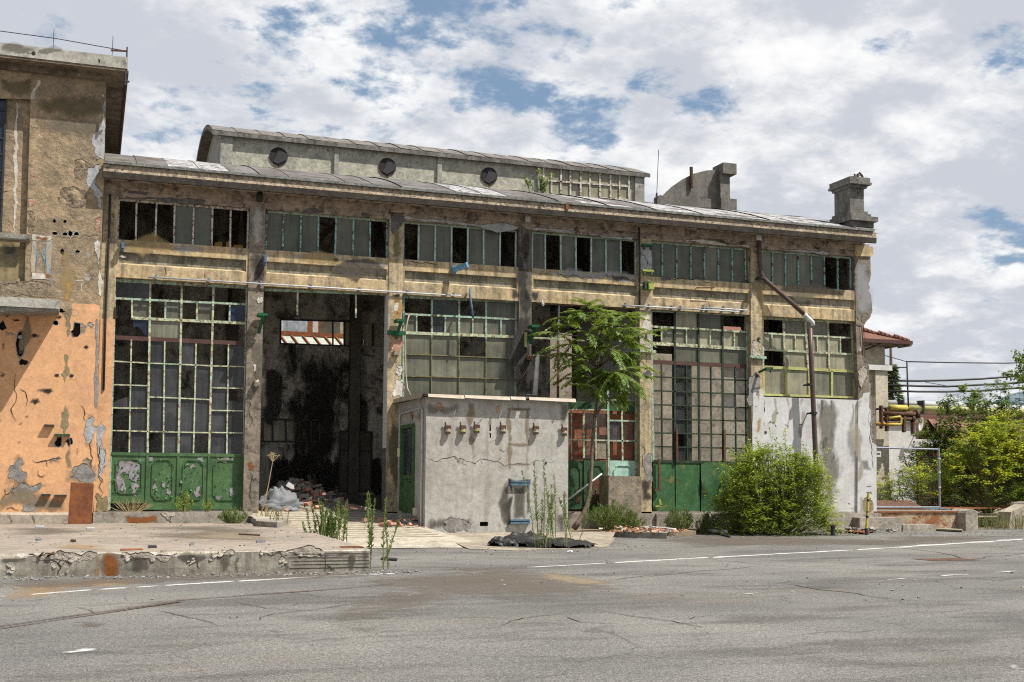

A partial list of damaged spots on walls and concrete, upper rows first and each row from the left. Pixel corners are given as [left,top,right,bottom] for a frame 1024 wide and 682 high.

damp [3,81,29,95]
peeling [58,94,106,296]
spalling [858,365,867,387]
peeling [7,456,42,512]
peeling [66,319,234,512]
crack [429,449,550,466]
damp [500,408,530,524]
damp [819,400,839,509]
damp [851,404,868,480]
spalling [444,517,471,532]
spalling [29,550,97,577]
rust [103,553,118,576]